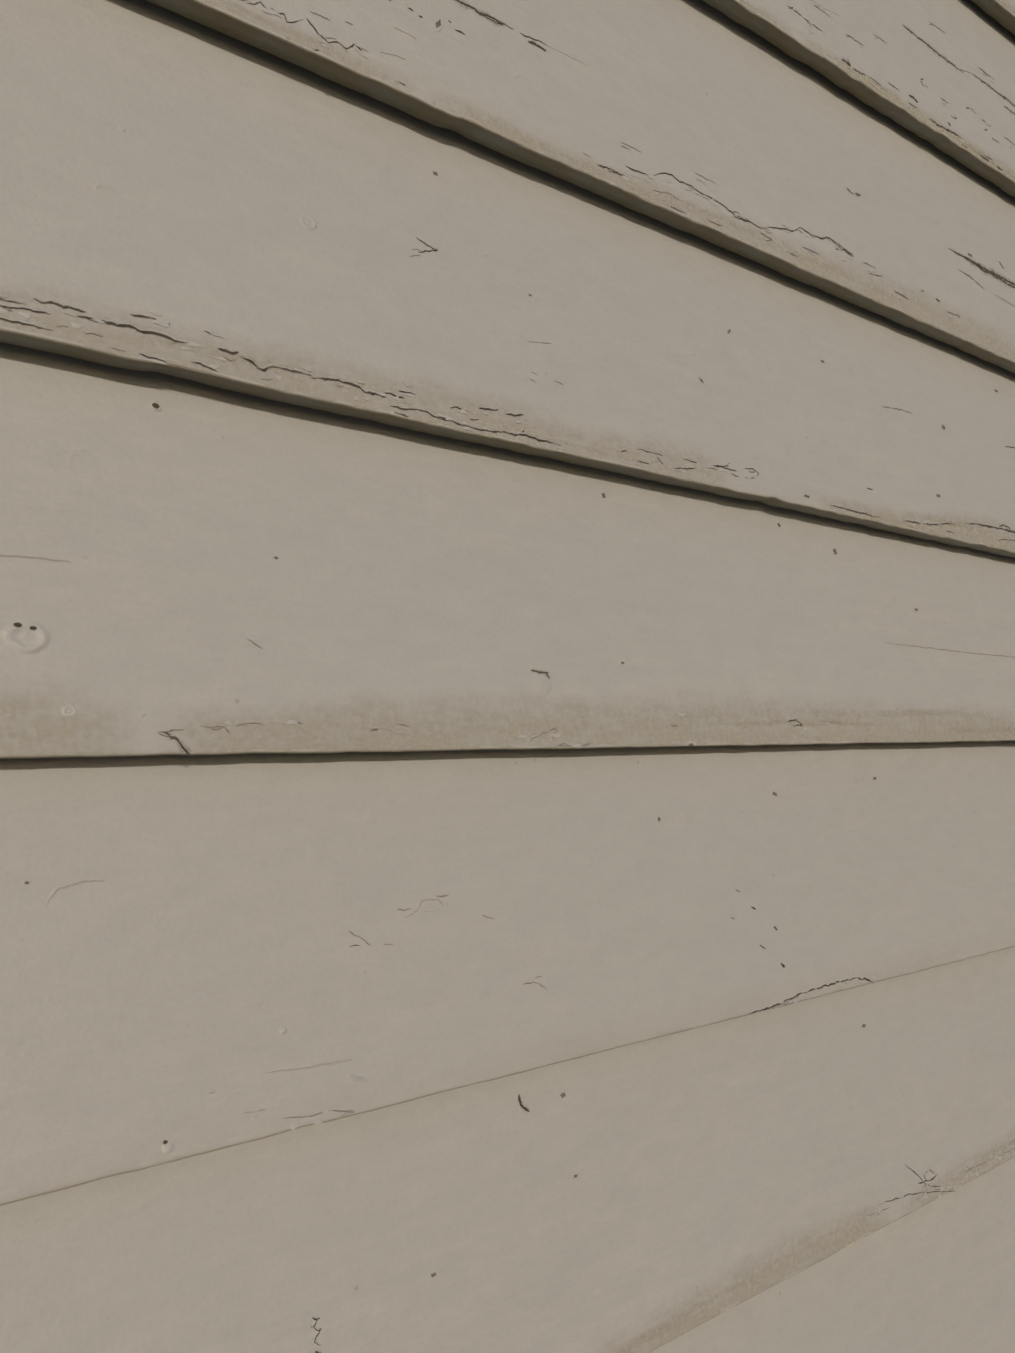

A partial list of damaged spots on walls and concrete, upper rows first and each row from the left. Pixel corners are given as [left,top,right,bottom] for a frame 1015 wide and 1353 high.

peeling [241,0,368,65]
peeling [584,152,883,282]
peeling [0,297,565,452]
peeling [621,448,759,486]
peeling [905,519,1015,541]